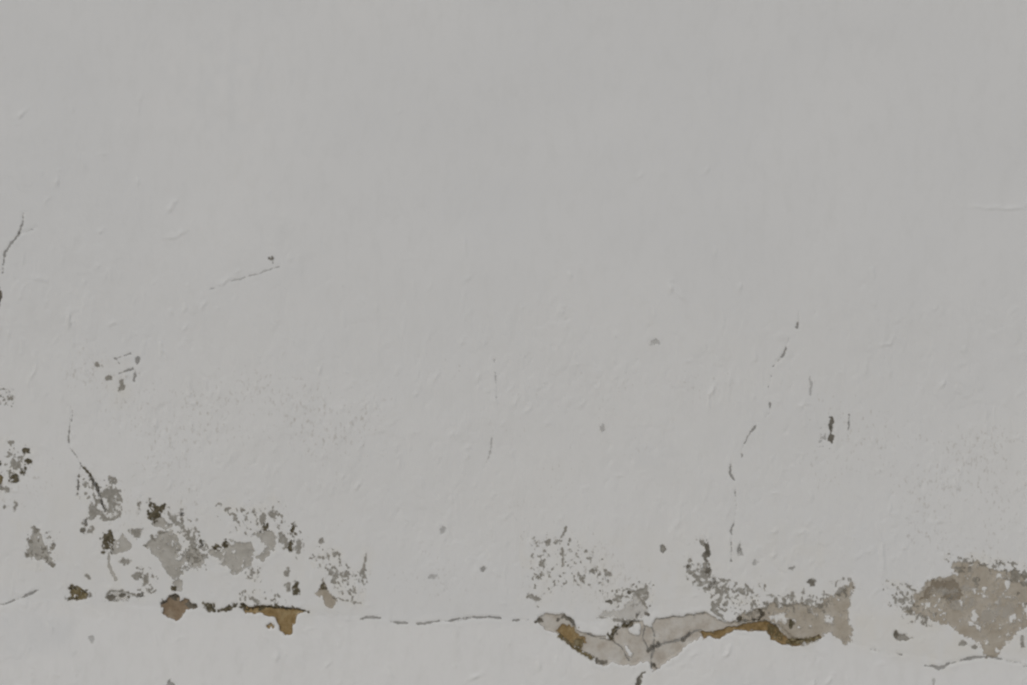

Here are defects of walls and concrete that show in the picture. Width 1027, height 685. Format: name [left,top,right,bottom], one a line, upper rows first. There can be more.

spalling [68,574,92,600]
peeling [100,498,367,635]
crack [361,616,519,625]
spalling [534,577,855,685]
crack [899,654,1002,670]
peeling [883,553,1027,659]